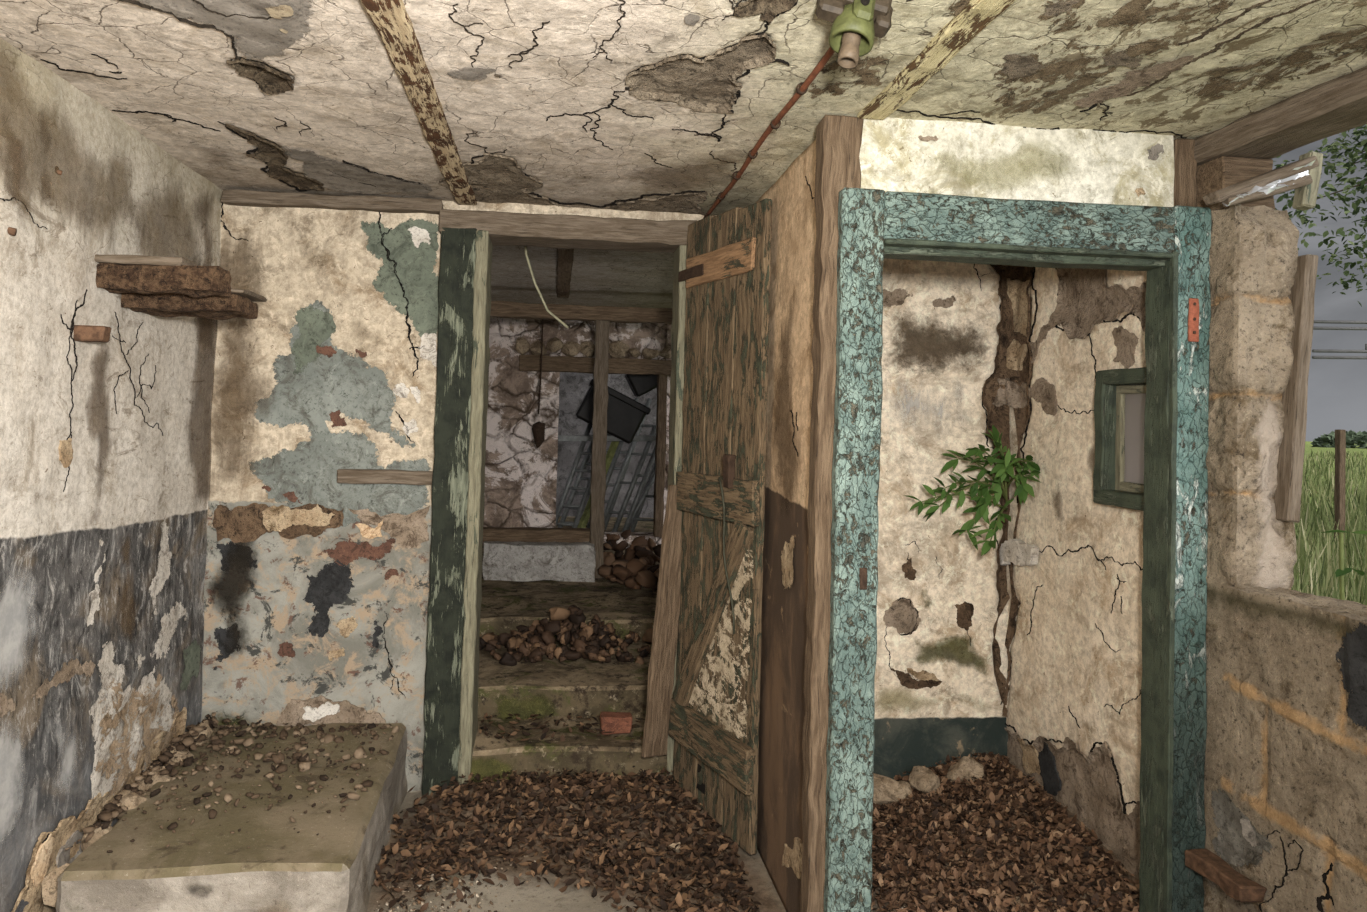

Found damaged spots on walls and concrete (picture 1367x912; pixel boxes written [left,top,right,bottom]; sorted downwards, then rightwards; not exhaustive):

peeling [119,0,314,95]
crack [546,0,737,171]
crack [722,0,769,35]
spalling [625,0,893,114]
crack [0,197,47,229]
leakage [190,317,254,496]
peeling [212,300,431,661]
leakage [211,542,255,651]
flaking render [982,265,1146,880]
peeling [0,693,15,718]
peeling [11,519,238,912]
crack [1259,830,1334,912]